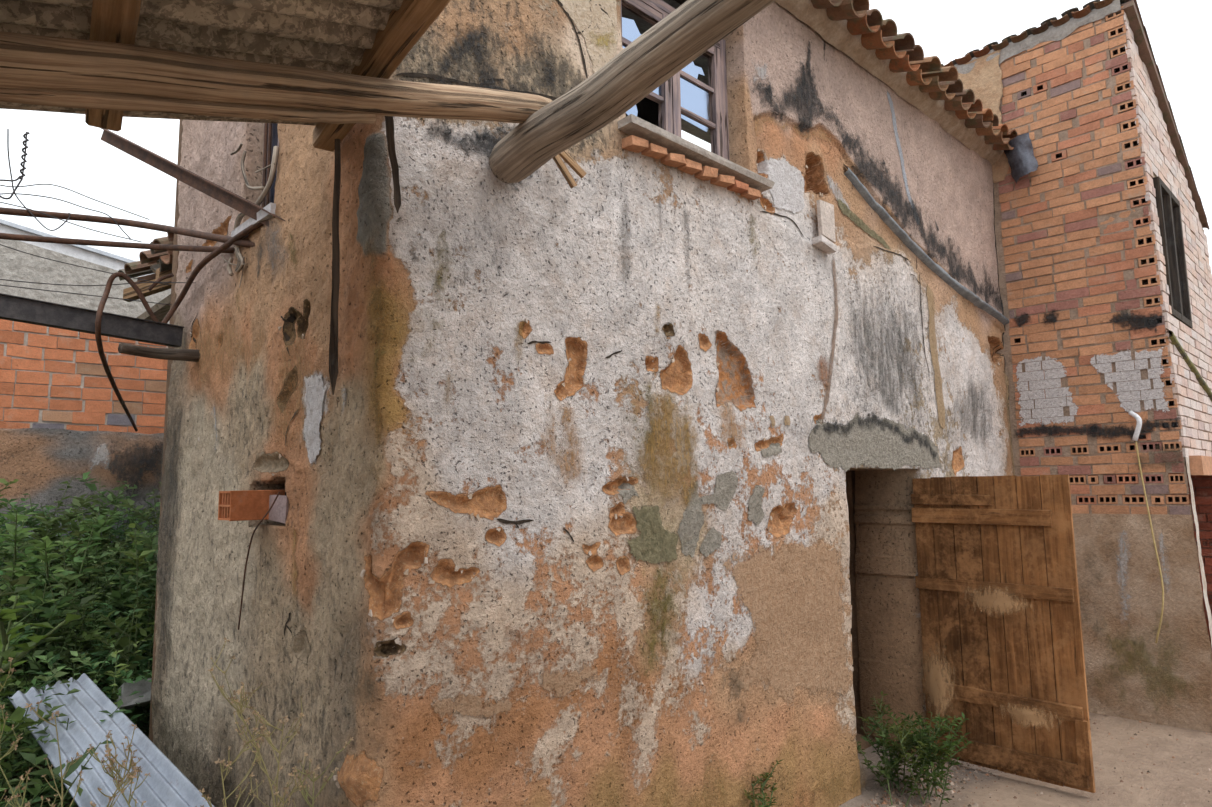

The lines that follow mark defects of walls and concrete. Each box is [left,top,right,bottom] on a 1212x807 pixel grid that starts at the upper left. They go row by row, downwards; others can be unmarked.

crack [557,0,615,78]
crack [395,72,557,101]
water stain [756,42,1030,327]
spalling [519,318,588,401]
spalling [645,324,756,411]
water stain [814,259,945,459]
water stain [961,385,986,439]
water stain [1016,417,1184,438]
peeling [1090,347,1170,412]
spalling [425,485,507,547]
spalling [360,541,480,657]
flaking render [723,502,850,706]